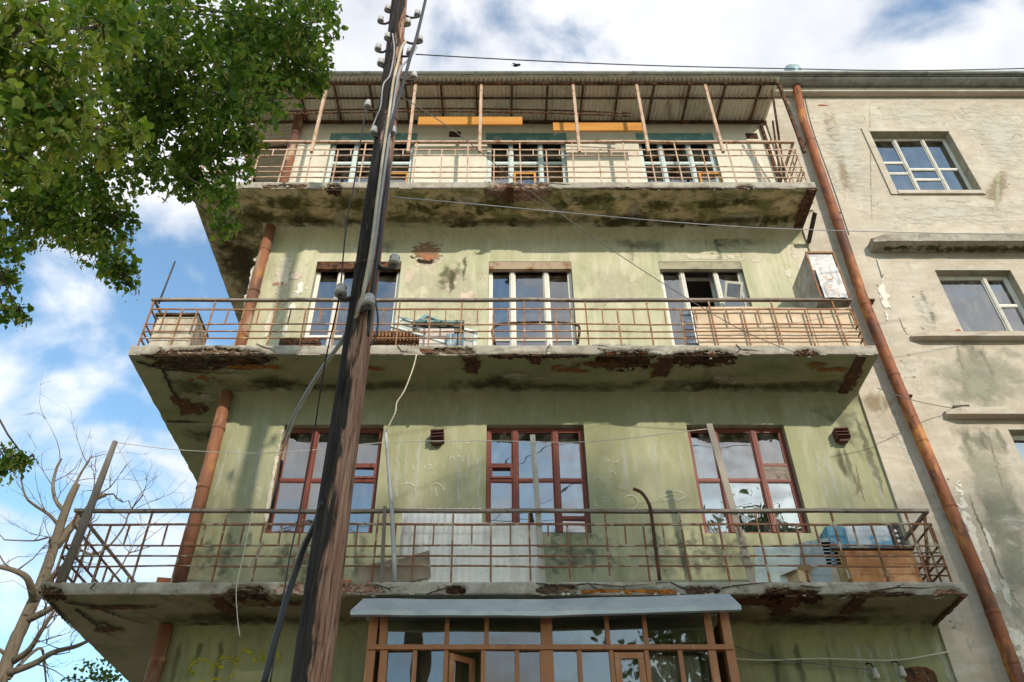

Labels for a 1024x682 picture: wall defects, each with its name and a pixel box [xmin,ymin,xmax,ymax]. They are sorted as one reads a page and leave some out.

leakage [455,212,549,227]
leakage [661,213,758,226]
peeling [263,250,307,337]
peeling [404,242,476,334]
spalling [143,345,281,373]
spalling [419,345,474,355]
spalling [488,348,656,373]
spalling [671,348,738,370]
corrosion [170,396,209,418]
spalling [224,582,305,608]
spalling [751,585,823,612]
spalling [839,590,912,600]